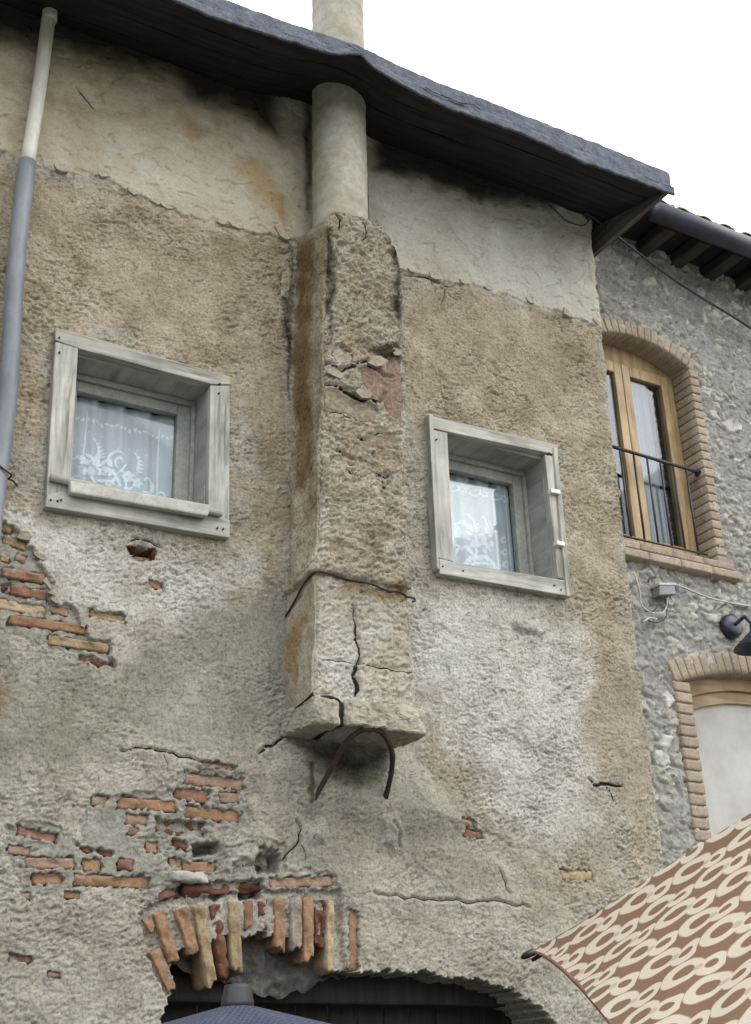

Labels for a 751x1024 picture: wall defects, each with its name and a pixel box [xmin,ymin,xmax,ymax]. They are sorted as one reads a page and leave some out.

crack [335,195,369,241]
flaking render [324,348,403,422]
spalling [127,545,157,561]
flaking render [0,524,127,670]
crack [294,609,412,740]
crack [121,747,197,764]
crack [259,737,283,754]
crack [588,779,622,802]
flaking render [6,759,337,905]
crack [384,870,527,914]
flaking render [6,949,36,964]
flaking render [340,903,365,973]